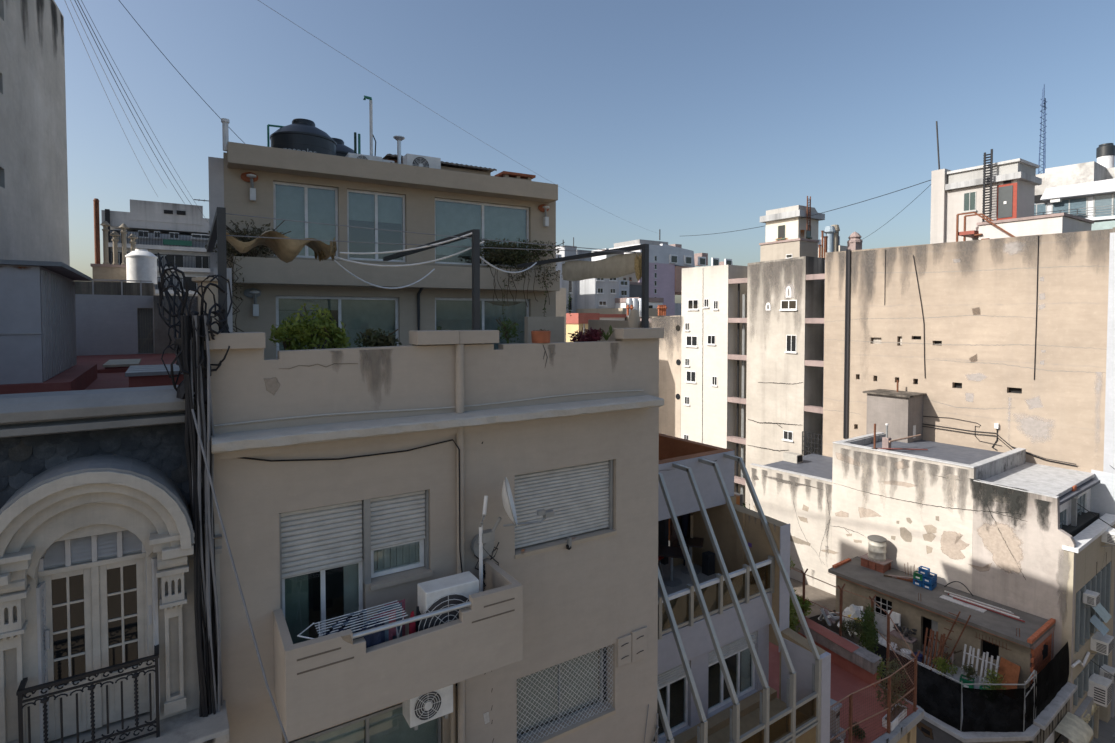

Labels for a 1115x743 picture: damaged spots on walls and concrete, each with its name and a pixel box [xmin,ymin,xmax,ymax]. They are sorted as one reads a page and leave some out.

leakage [22,0,63,44]
leakage [994,235,1038,253]
leakage [1090,229,1110,245]
leakage [827,243,941,292]
leakage [752,468,831,509]
leakage [843,448,1050,527]
spalling [835,507,880,518]